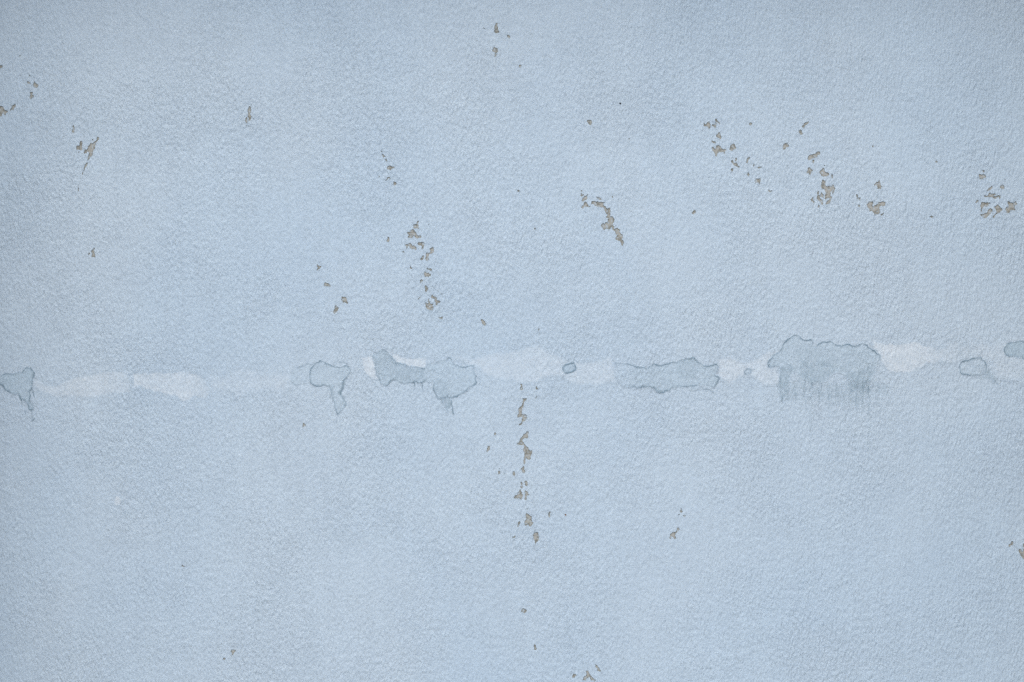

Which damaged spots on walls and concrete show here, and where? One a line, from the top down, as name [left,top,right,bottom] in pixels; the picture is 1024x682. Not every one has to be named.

peeling [72,125,99,175]
peeling [580,190,624,246]
peeling [704,119,772,192]
peeling [807,151,835,207]
peeling [975,170,1017,218]
peeling [402,221,443,319]
water stain [0,367,35,421]
water stain [289,359,352,415]
water stain [372,349,477,414]
water stain [614,357,721,394]
water stain [767,334,881,388]
peeling [498,384,539,544]